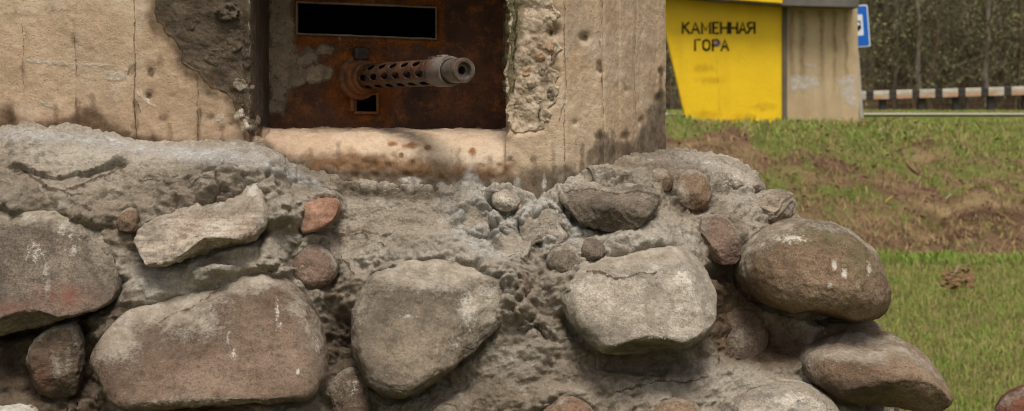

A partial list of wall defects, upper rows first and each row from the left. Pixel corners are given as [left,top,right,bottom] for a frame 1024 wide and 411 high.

rust [292,0,443,47]
spalling [155,0,259,136]
spalling [497,0,563,134]
water stain [588,93,666,165]
crack [14,163,201,196]